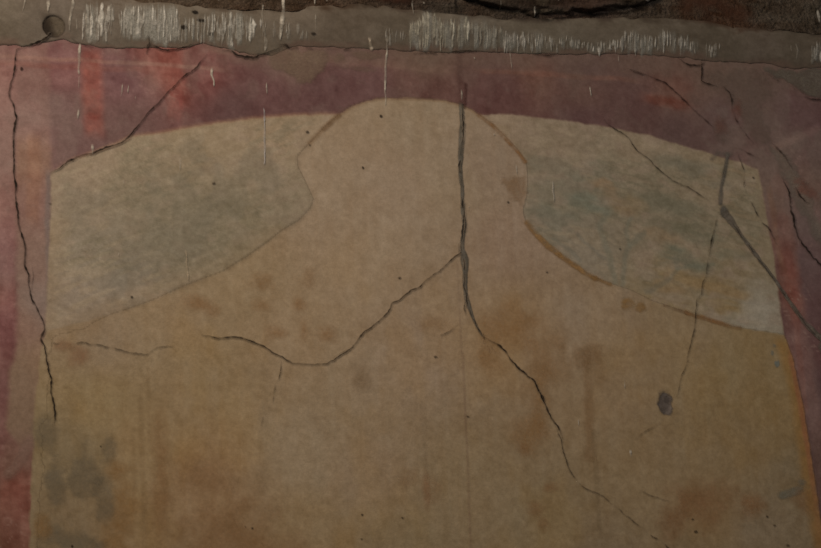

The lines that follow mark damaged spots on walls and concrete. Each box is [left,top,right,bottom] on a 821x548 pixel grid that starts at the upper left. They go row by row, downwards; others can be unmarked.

water stain [82,4,109,36]
water stain [121,6,177,41]
crack [147,42,187,51]
water stain [189,13,266,46]
water stain [409,15,506,51]
crack [685,63,738,122]
crack [59,62,200,169]
crack [687,153,821,349]
crack [326,104,567,461]
crack [211,336,288,377]